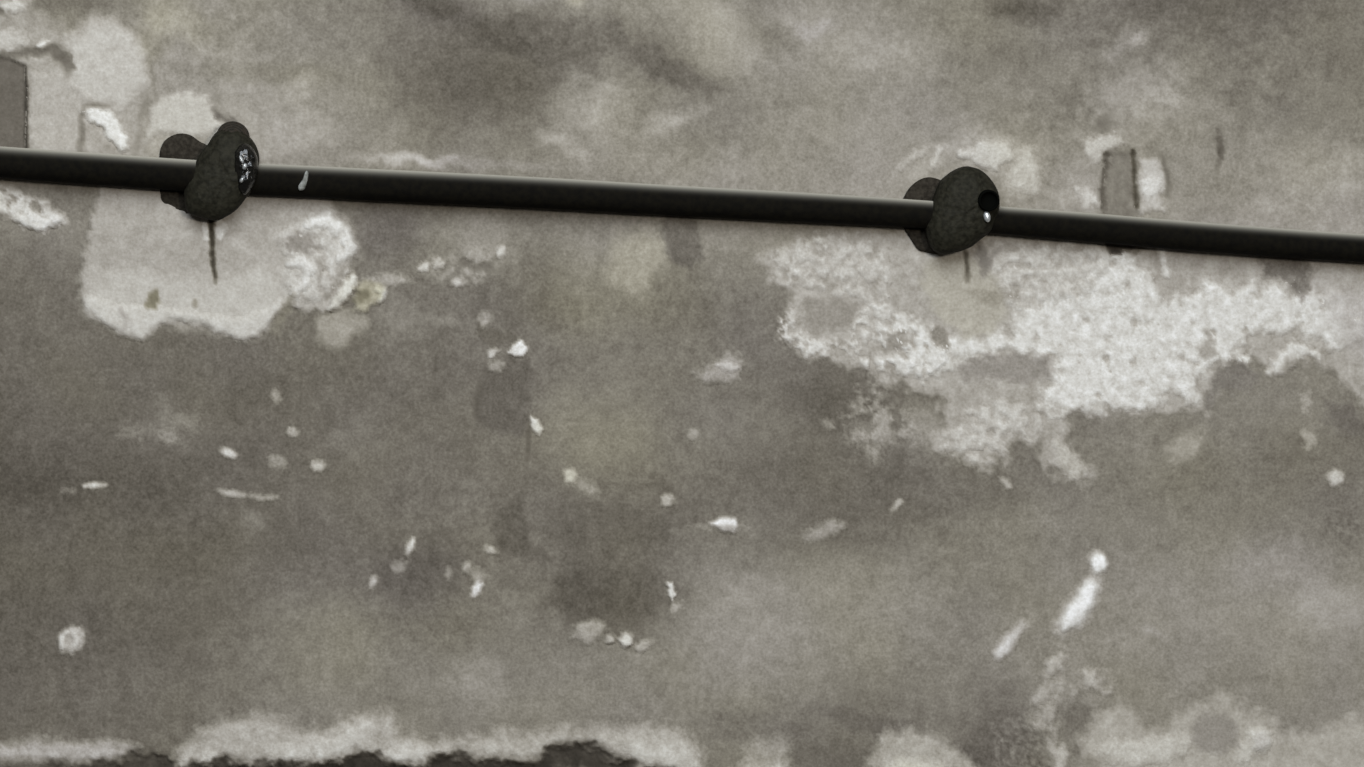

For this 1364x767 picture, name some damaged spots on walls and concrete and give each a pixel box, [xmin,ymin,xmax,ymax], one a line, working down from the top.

peeling [0,0,347,164]
damp [374,0,737,103]
peeling [0,182,509,356]
damp [750,224,1364,493]
damp [0,731,146,767]
damp [168,702,711,767]
damp [727,729,802,767]
damp [860,548,1364,767]